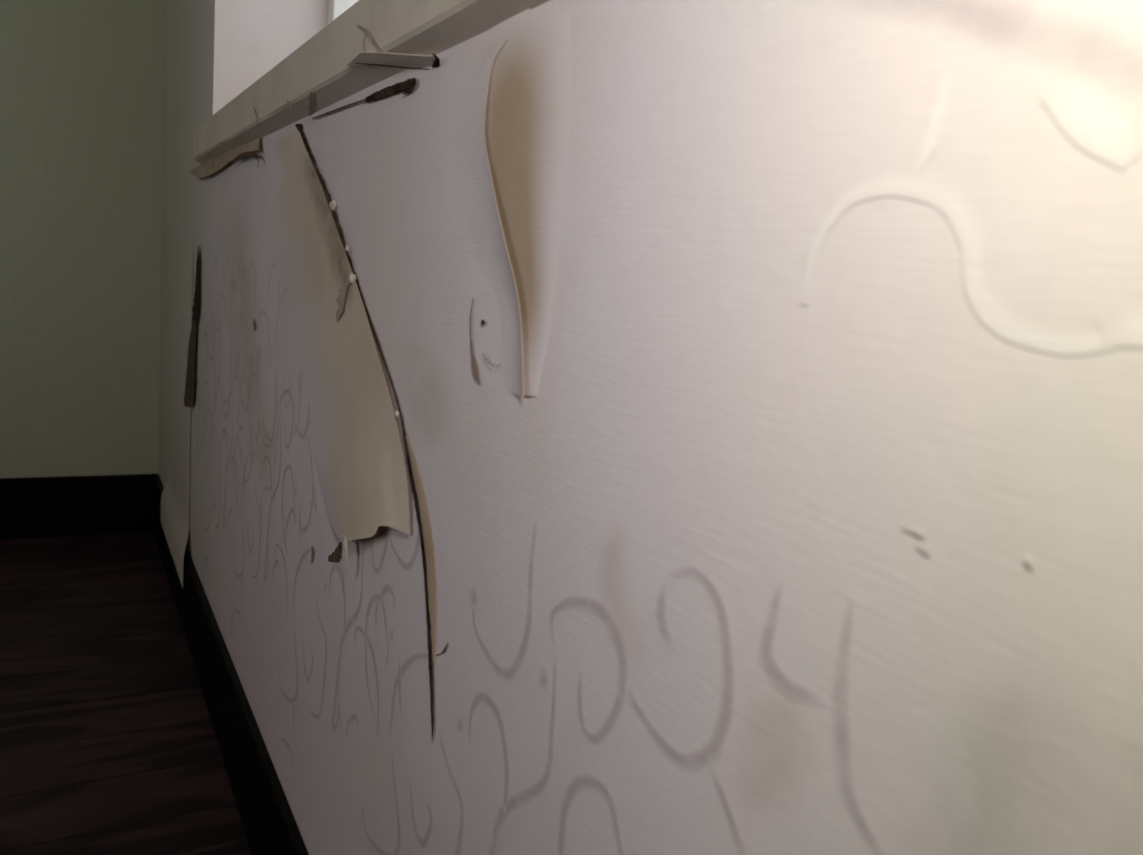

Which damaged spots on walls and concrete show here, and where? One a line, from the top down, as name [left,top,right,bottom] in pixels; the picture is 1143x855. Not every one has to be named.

flaking render [469,9,572,396]